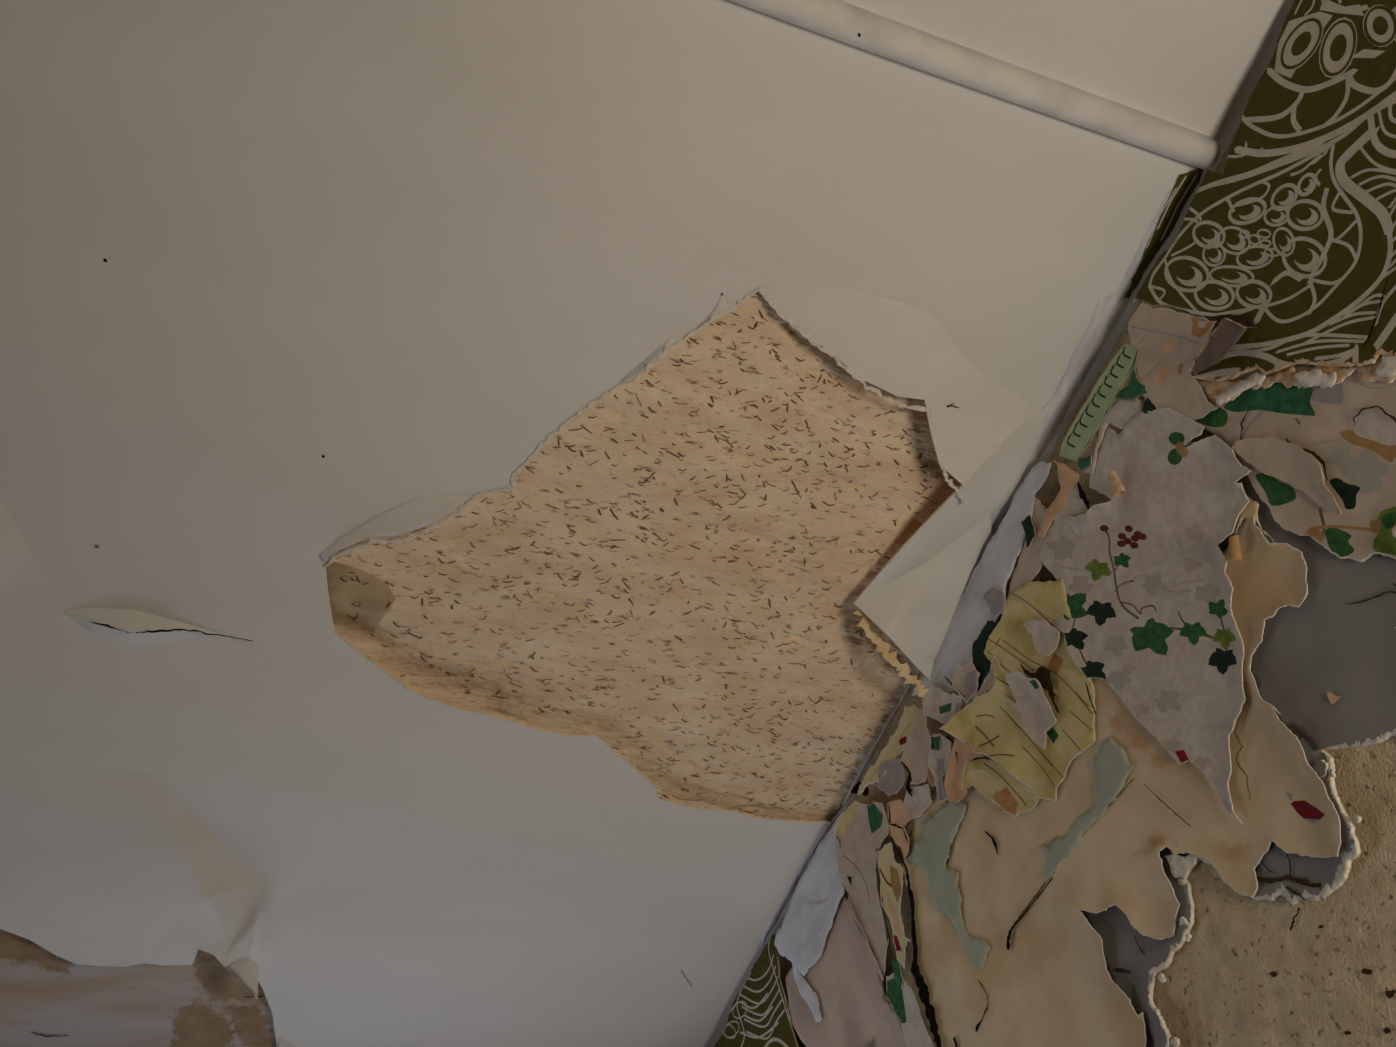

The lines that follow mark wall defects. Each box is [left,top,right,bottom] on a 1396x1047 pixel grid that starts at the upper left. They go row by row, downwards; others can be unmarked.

peeling [1243,485,1396,905]
flaking render [786,893,908,1047]
peeling [908,801,990,969]
peeling [1040,737,1134,881]
peeling [1082,847,1213,1047]